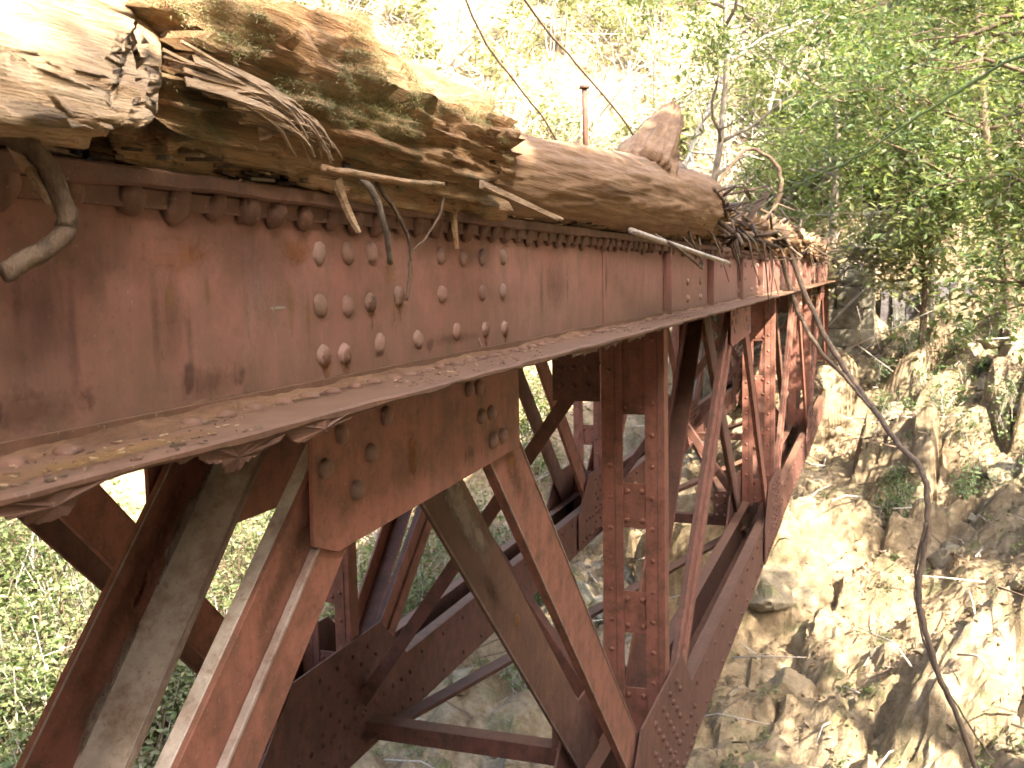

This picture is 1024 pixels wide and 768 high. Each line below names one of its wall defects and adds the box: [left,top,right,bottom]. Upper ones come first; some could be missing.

rust [322,347,352,369]
rust [570,329,662,358]
rust [161,412,353,473]
peeling [82,628,136,752]